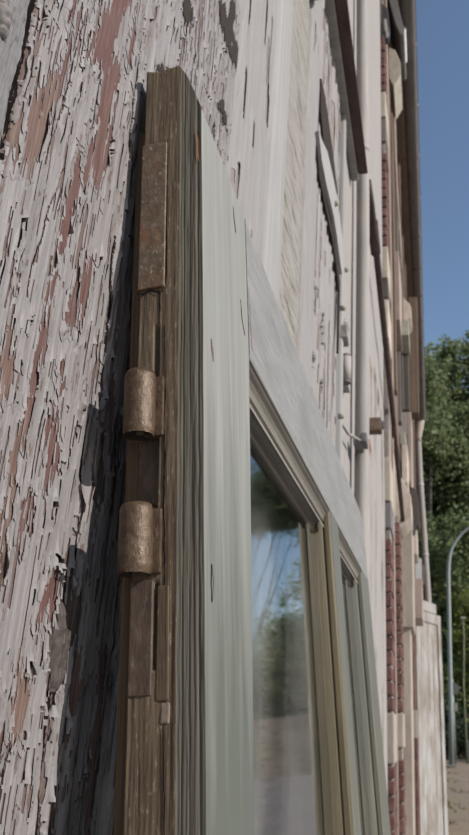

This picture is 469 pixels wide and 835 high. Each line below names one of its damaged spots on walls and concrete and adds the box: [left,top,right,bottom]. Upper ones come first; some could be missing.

peeling [0,0,138,620]
peeling [0,549,86,783]